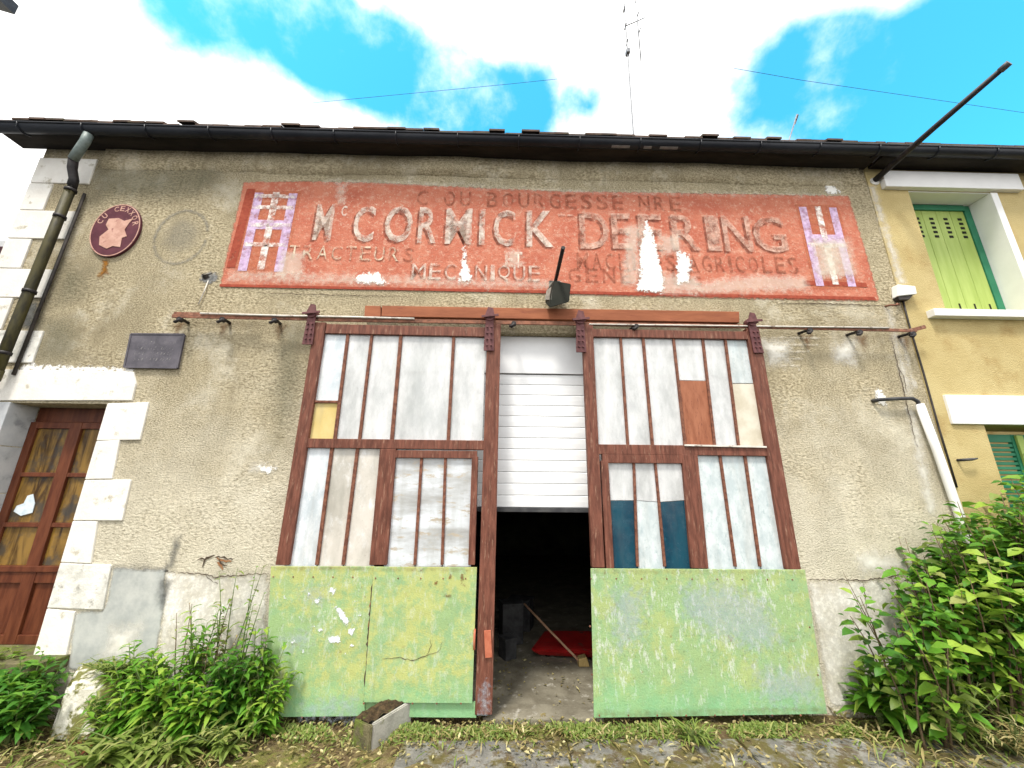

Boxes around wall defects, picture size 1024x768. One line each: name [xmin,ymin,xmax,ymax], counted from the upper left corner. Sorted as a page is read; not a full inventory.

peeling [355,272,397,286]
peeling [458,246,472,284]
peeling [629,220,692,294]
crack [167,555,266,584]